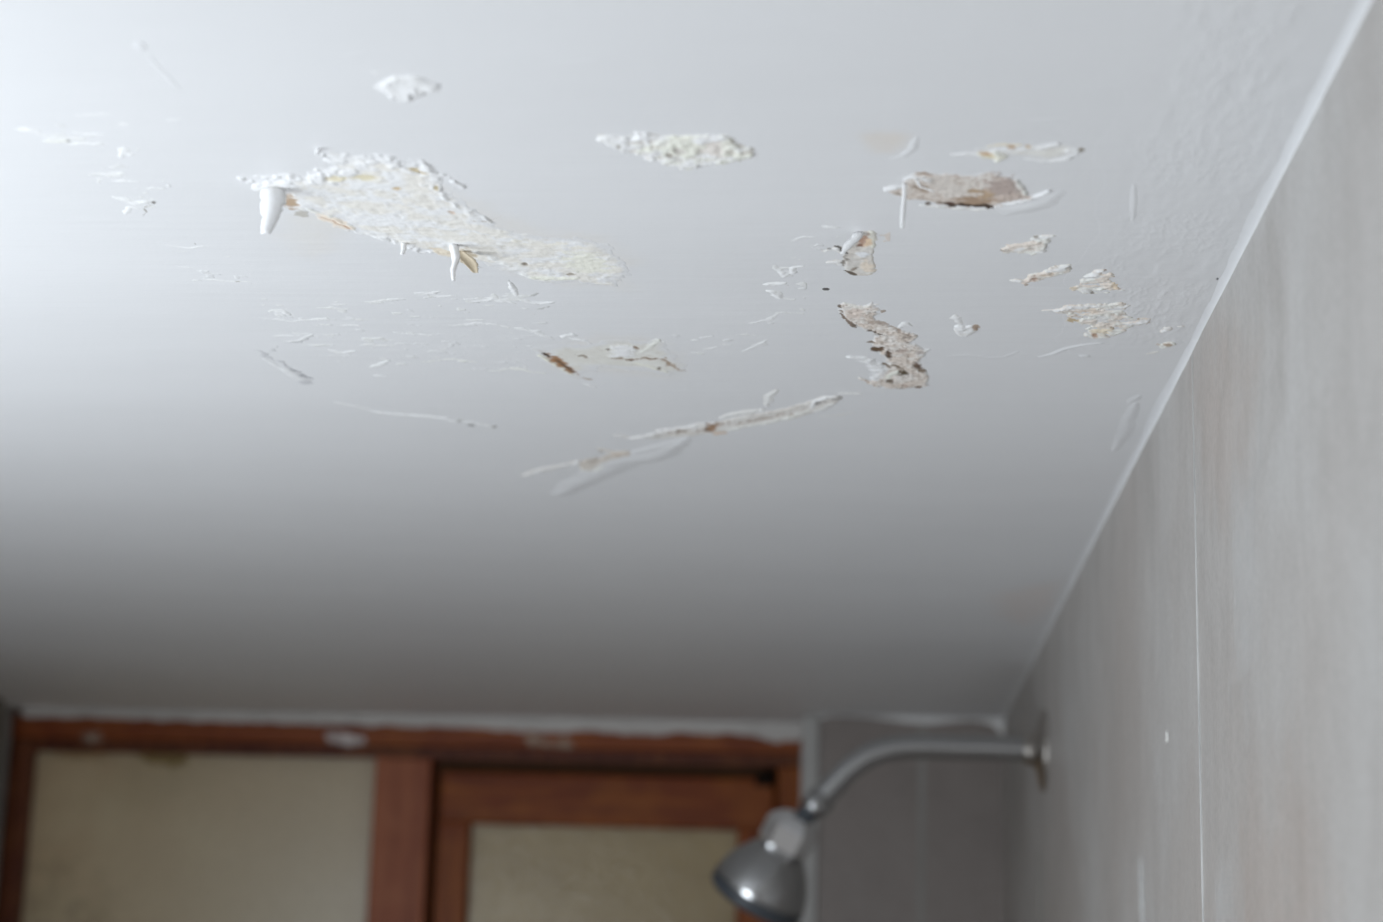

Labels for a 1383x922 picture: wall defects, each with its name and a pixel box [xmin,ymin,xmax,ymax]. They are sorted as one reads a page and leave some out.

peeling [371,71,442,102]
peeling [595,131,755,171]
peeling [236,148,632,309]
spalling [821,142,1086,276]
peeling [531,333,688,388]
spalling [837,302,931,389]